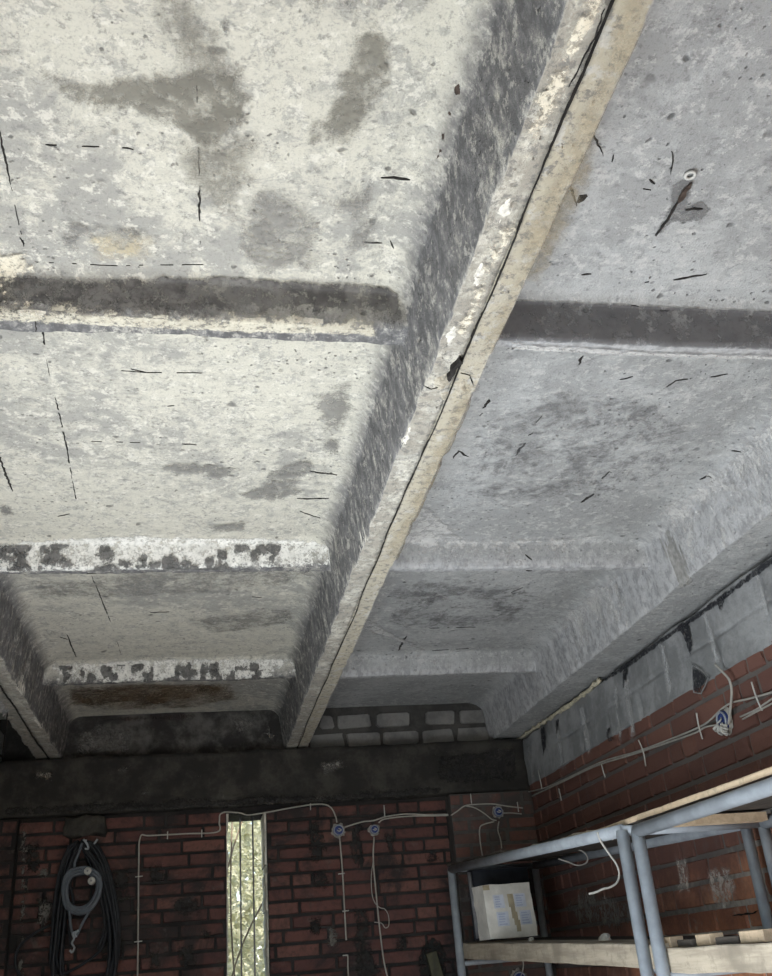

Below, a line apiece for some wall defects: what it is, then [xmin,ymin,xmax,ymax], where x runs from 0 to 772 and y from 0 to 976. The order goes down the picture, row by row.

water stain [60,0,251,204]
water stain [310,34,389,144]
crack [0,132,25,260]
water stain [0,192,402,325]
crack [121,367,198,375]
crack [297,0,615,748]
crack [0,457,13,492]
crack [55,398,77,517]
water stain [242,462,313,501]
peeling [0,535,330,573]
rust [71,684,236,721]
peeling [52,658,296,684]